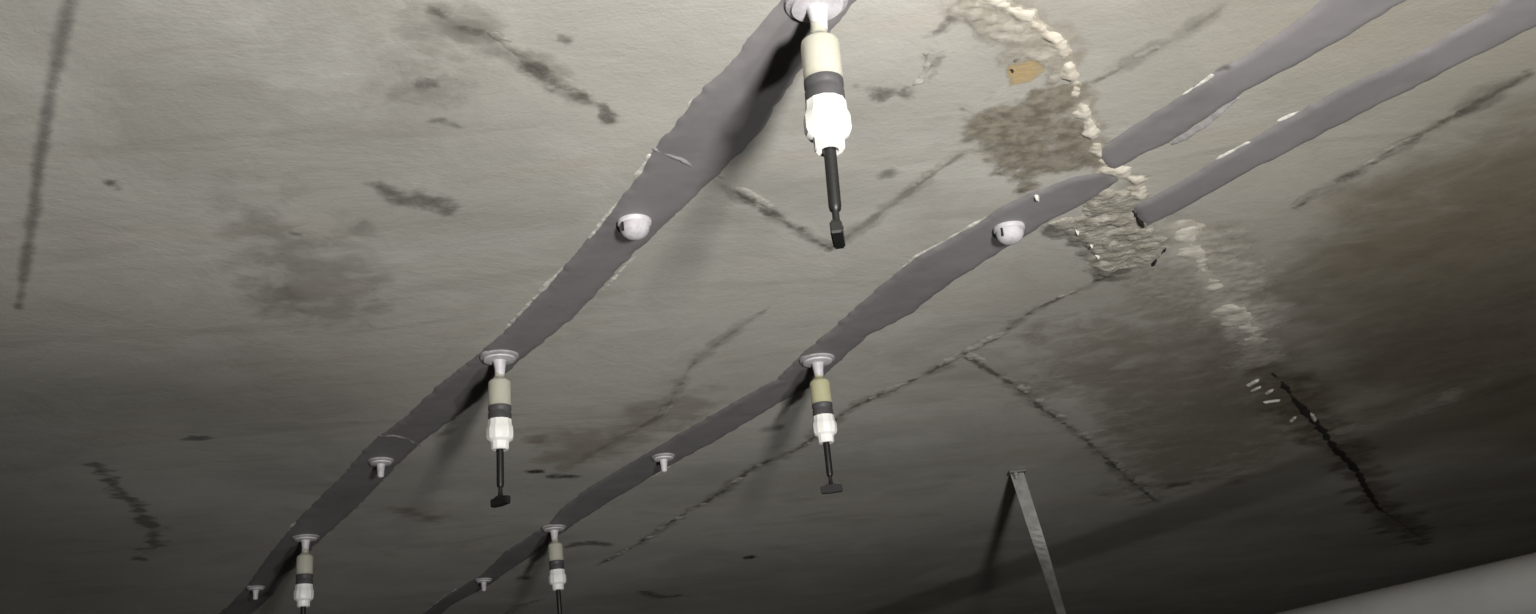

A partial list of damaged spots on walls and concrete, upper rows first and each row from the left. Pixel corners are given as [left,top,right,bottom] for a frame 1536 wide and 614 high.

rust [1008,59,1043,84]
damp [948,0,1150,200]
damp [378,185,448,212]
damp [1120,219,1288,370]
crack [1246,364,1428,545]